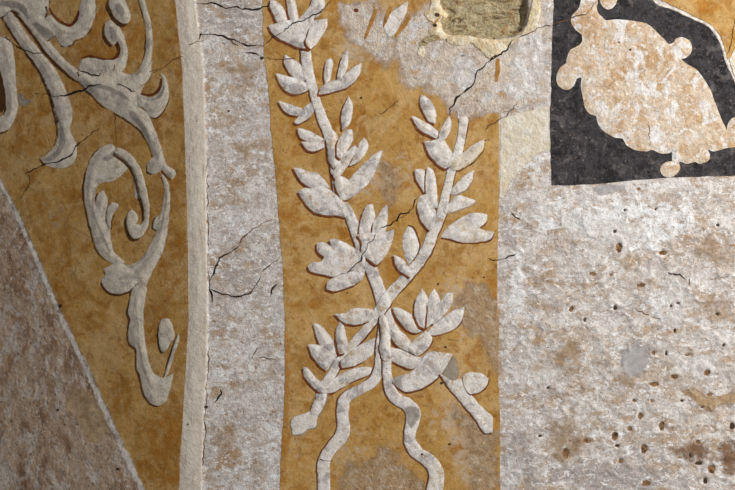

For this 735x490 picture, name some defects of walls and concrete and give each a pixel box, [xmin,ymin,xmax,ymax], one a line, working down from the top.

crack [30,1,331,97]
peeling [338,0,550,119]
crack [449,1,597,113]
crack [18,130,96,201]
crack [206,159,278,301]
crack [347,198,418,274]